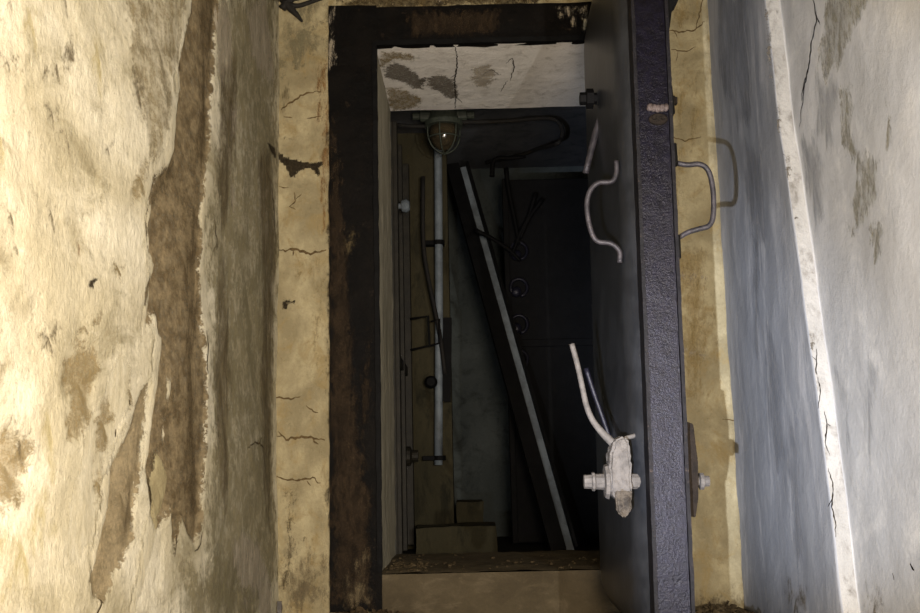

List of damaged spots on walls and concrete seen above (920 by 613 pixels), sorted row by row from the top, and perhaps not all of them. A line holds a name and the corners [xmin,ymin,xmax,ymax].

crack [452,47,462,109]
crack [799,1,820,127]
crack [266,91,326,256]
leakage [62,315,116,452]
spalling [68,0,232,613]
leakage [181,0,317,613]
crack [247,431,325,511]
crack [276,396,318,413]
corrosion [317,102,373,609]
leakage [291,559,325,610]